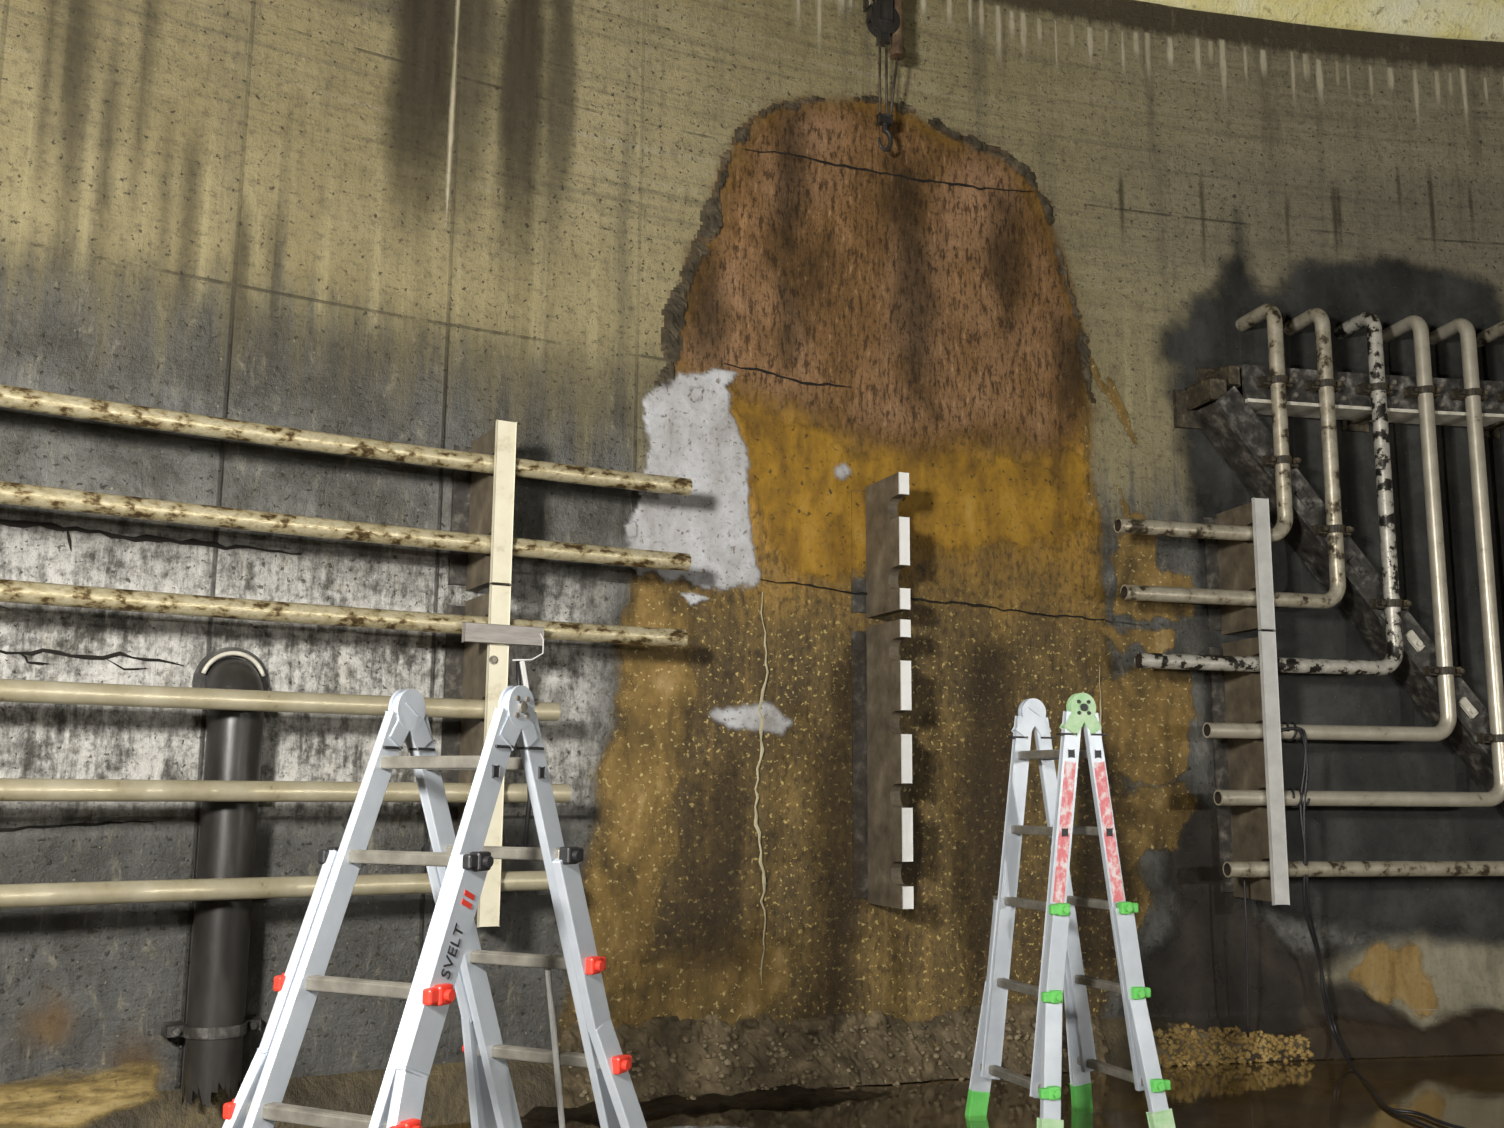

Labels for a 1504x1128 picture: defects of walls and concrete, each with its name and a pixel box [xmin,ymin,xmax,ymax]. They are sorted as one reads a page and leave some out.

leakage [392,0,487,207]
leakage [501,0,573,199]
peeling [625,96,825,605]
spalling [854,95,1138,505]
leakage [1162,251,1504,399]
crack [0,648,184,670]
crack [0,519,302,555]
peeling [711,703,791,734]
crack [754,579,867,984]
rust [582,101,1196,1040]
leakage [1142,414,1504,1062]
rust [559,987,578,1044]